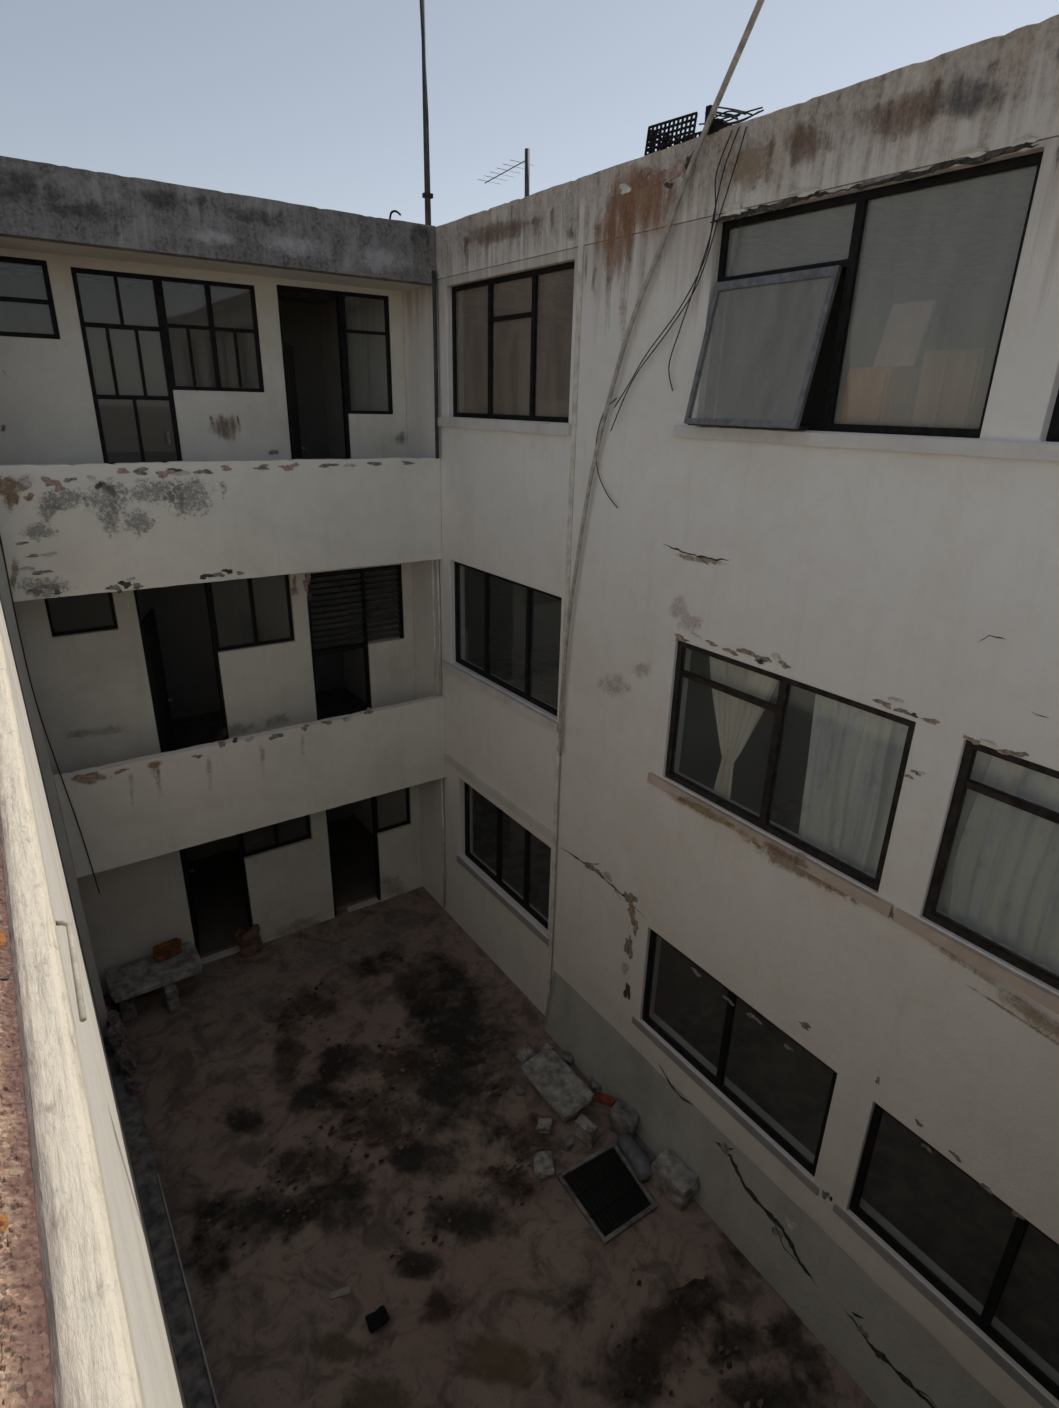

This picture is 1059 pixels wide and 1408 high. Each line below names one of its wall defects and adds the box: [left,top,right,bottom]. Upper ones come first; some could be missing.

damp [876,77,982,140]
damp [791,124,831,163]
rust [595,169,671,273]
peeling [0,465,232,509]
peeling [10,522,69,598]
peeling [200,569,244,580]
peeling [674,633,792,669]
peeling [872,697,940,725]
crack [560,847,646,919]
crack [659,1065,695,1107]
crack [715,1141,817,1286]
crack [844,1310,937,1408]